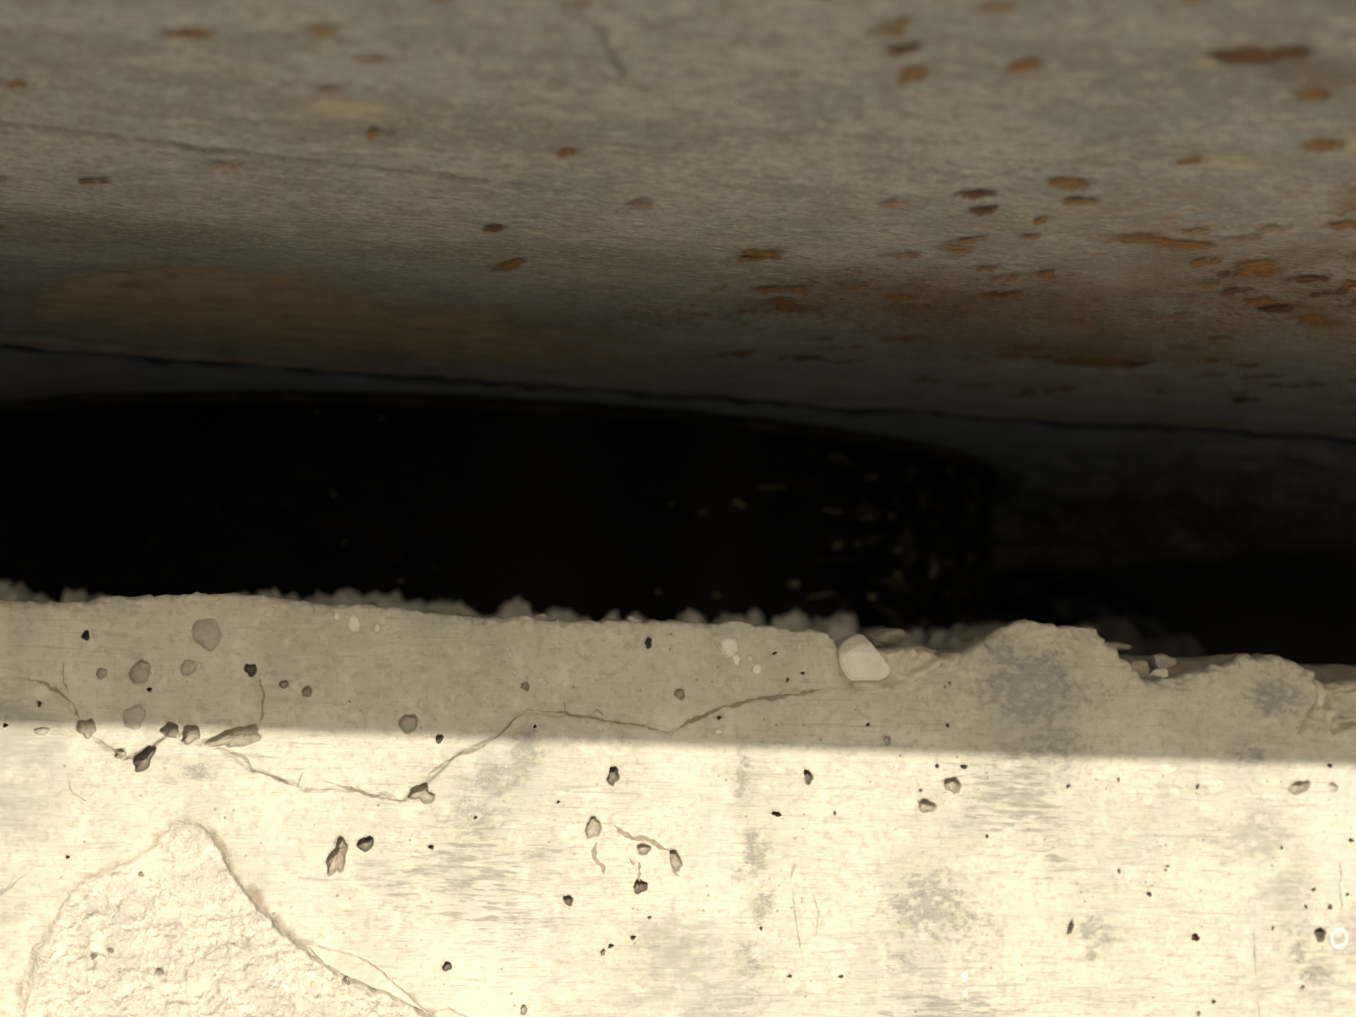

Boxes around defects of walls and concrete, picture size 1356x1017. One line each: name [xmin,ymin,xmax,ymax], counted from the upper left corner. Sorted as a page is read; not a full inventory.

rust [869,16,928,85]
rust [1212,46,1310,65]
rust [1303,138,1347,153]
rust [954,191,997,216]
rust [1050,178,1097,206]
rust [728,250,782,263]
rust [1105,229,1356,328]
spalling [1298,675,1356,737]